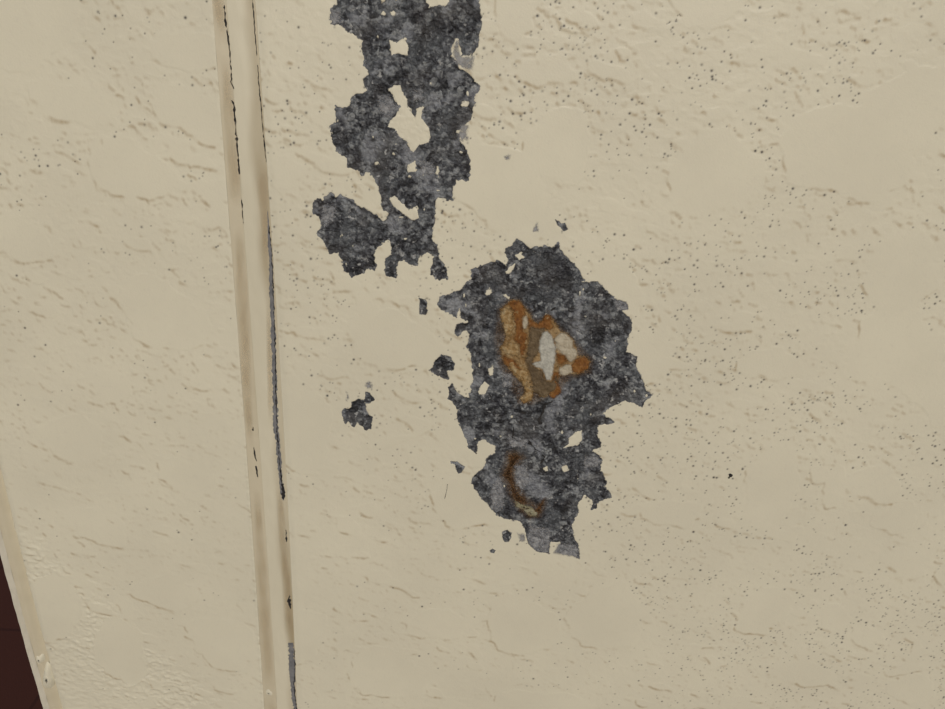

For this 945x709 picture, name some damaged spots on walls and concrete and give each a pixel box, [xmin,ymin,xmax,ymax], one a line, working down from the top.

peeling [312,0,482,281]
corrosion [503,300,553,369]
peeling [342,382,375,431]
peeling [419,239,652,559]
corrosion [549,353,589,399]
corrosion [504,454,544,517]